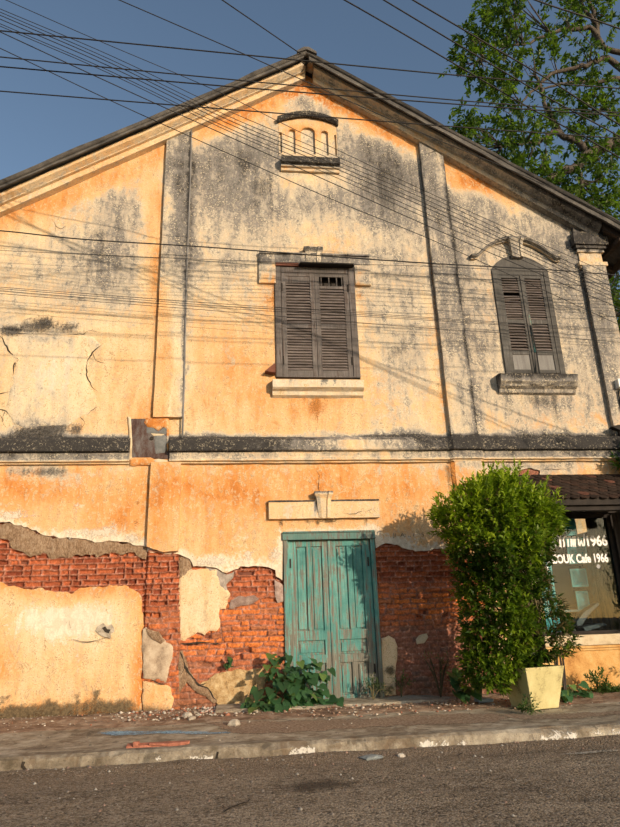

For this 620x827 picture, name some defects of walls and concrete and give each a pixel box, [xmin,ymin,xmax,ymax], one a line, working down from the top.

leakage [2,318,77,336]
crack [0,333,26,425]
crack [70,330,101,427]
flaking render [0,522,291,711]
flaking render [375,543,491,697]